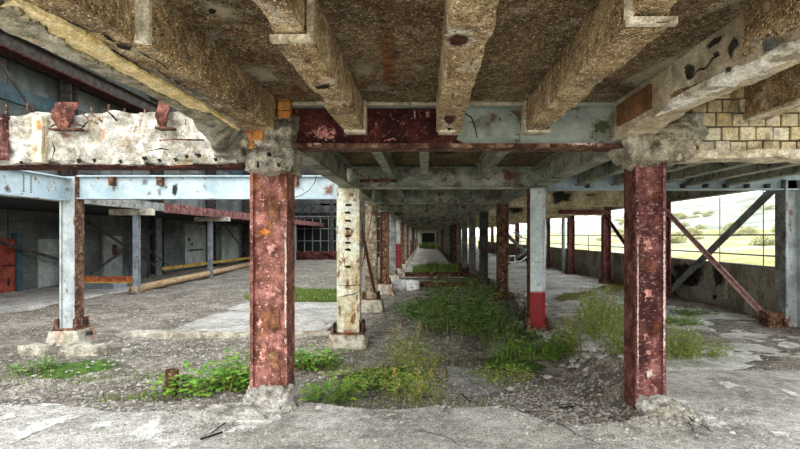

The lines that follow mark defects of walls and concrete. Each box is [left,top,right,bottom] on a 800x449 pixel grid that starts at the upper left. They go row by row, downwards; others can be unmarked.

rust [291,109,463,143]
rust [270,306,281,332]